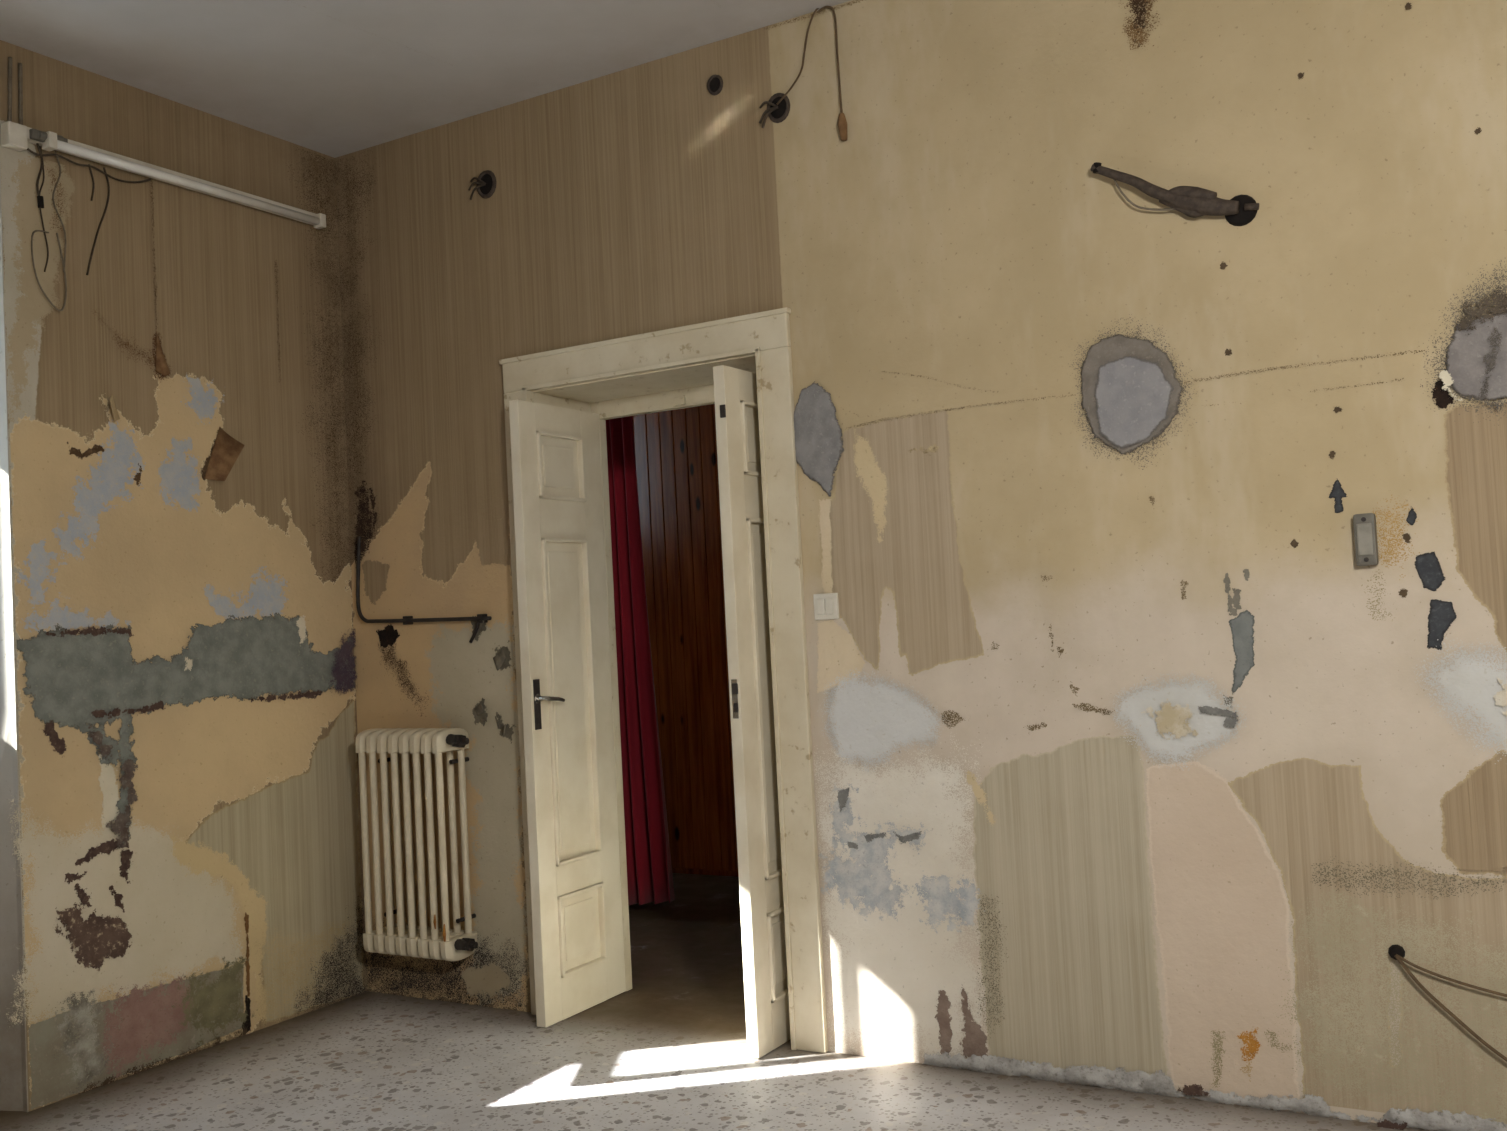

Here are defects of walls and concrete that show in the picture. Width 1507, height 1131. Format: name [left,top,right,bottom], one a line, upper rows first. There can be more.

damp [1120,0,1161,50]
peeling [1329,479,1348,513]
peeling [1406,506,1417,525]
peeling [5,156,530,1109]
spalling [1199,569,1255,728]
peeling [1414,552,1457,650]
peeling [813,732,1507,1131]